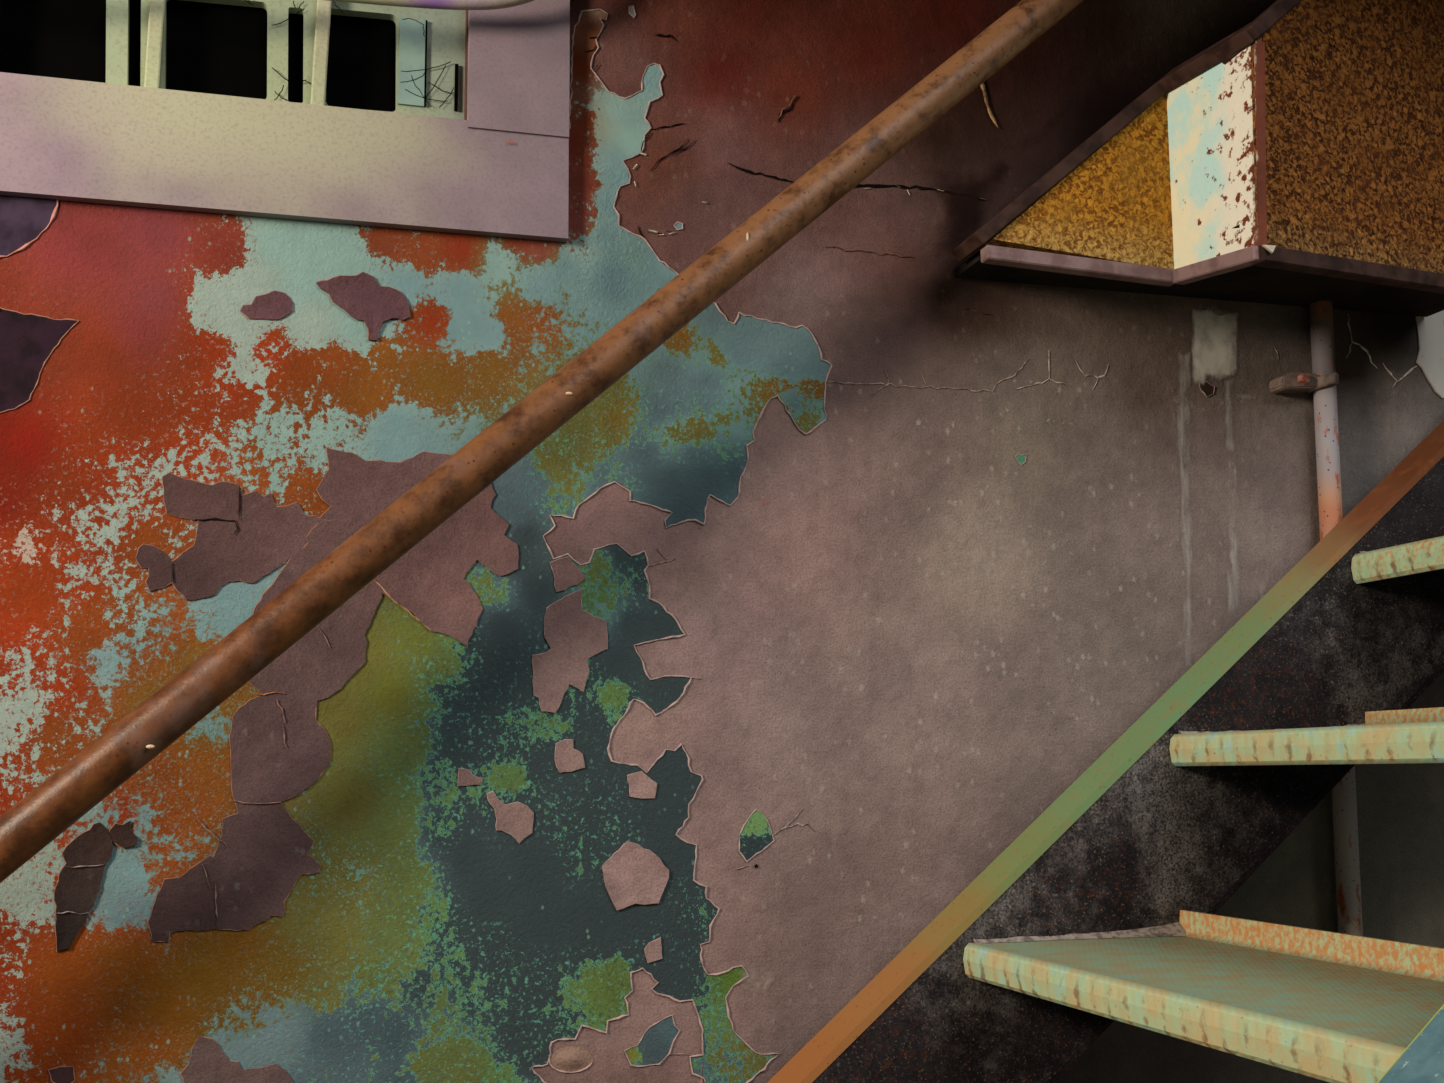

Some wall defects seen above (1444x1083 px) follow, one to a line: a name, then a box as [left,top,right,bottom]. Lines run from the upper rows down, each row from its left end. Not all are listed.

crack [778,96,798,122]
crack [641,123,695,170]
crack [729,163,794,182]
crack [856,184,985,200]
water stain [1181,311,1236,383]
crack [1346,313,1417,388]
peeling [1416,310,1444,399]
peeling [0,9,678,816]
peeling [0,302,833,1083]